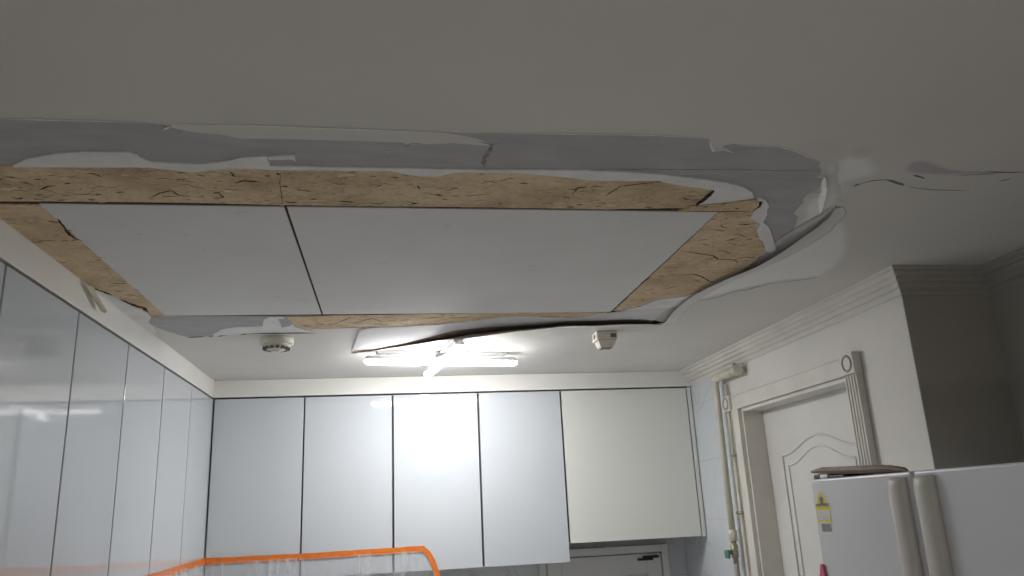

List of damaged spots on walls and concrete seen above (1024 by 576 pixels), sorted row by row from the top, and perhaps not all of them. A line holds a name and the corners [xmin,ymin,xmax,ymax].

peeling [697,155,884,302]
crack [853,172,1020,191]